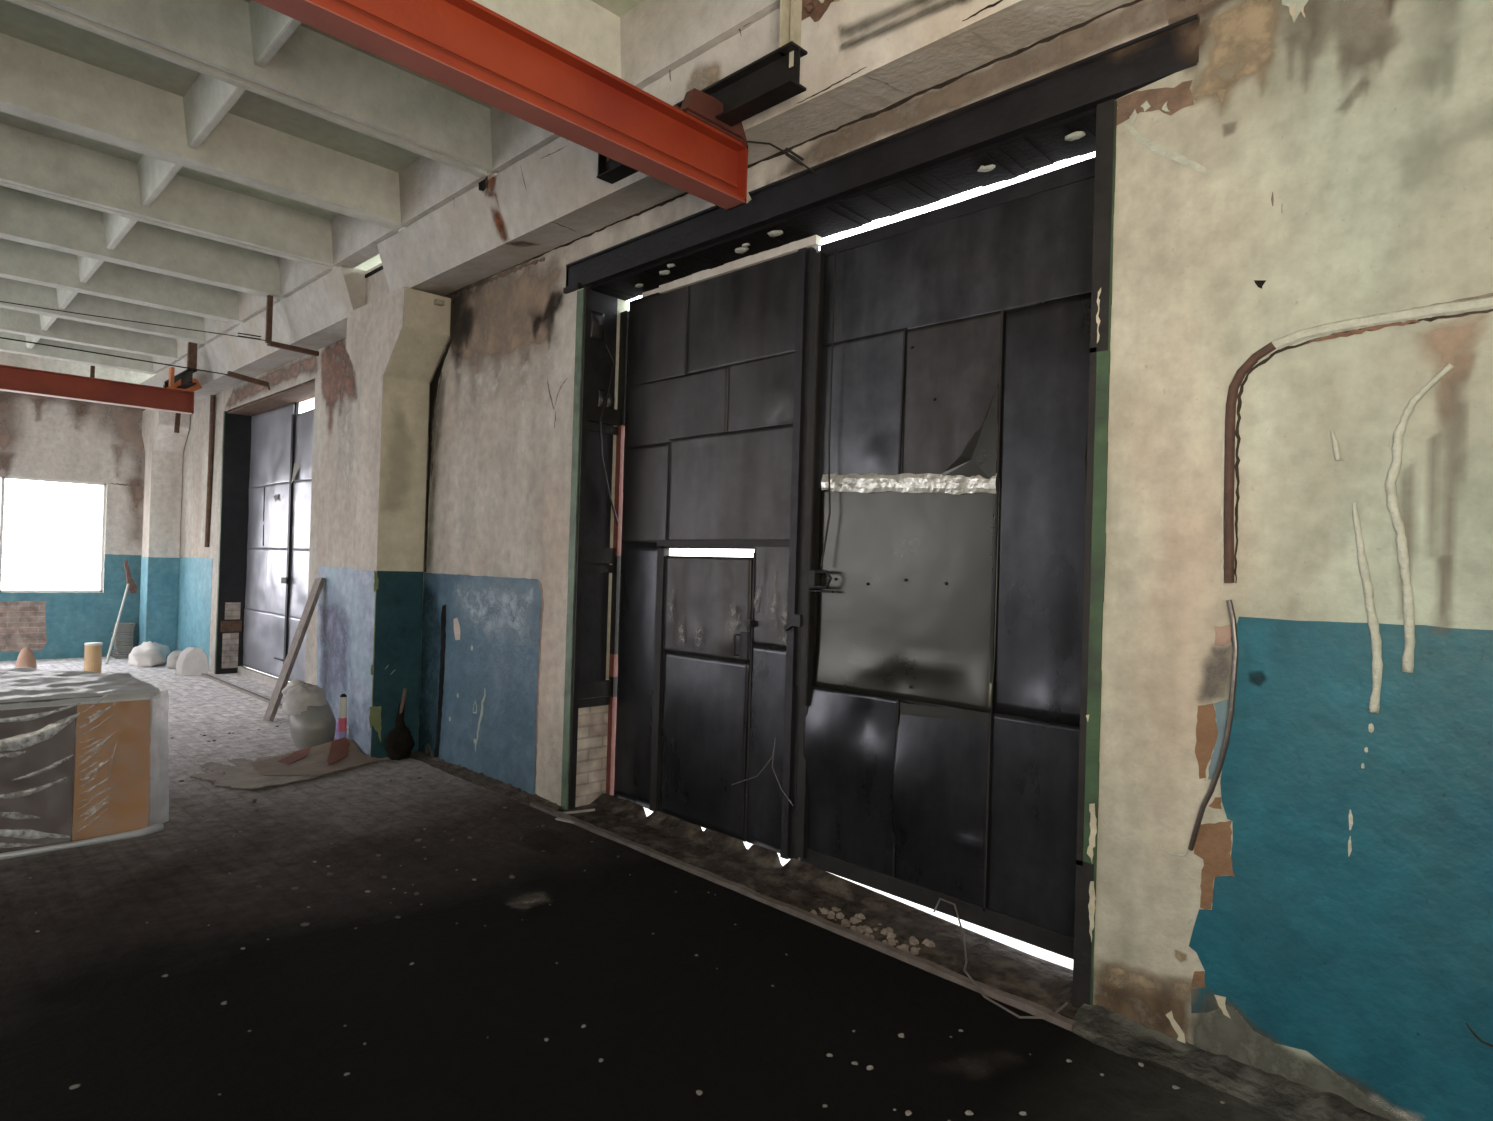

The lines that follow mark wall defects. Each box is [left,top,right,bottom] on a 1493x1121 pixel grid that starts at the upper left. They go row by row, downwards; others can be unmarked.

water stain [783,0,1225,174]
flaking render [1115,0,1308,126]
water stain [1289,0,1394,79]
corrosion [486,172,537,246]
water stain [450,264,561,414]
peeling [1195,699,1228,780]
peeling [1194,797,1235,910]